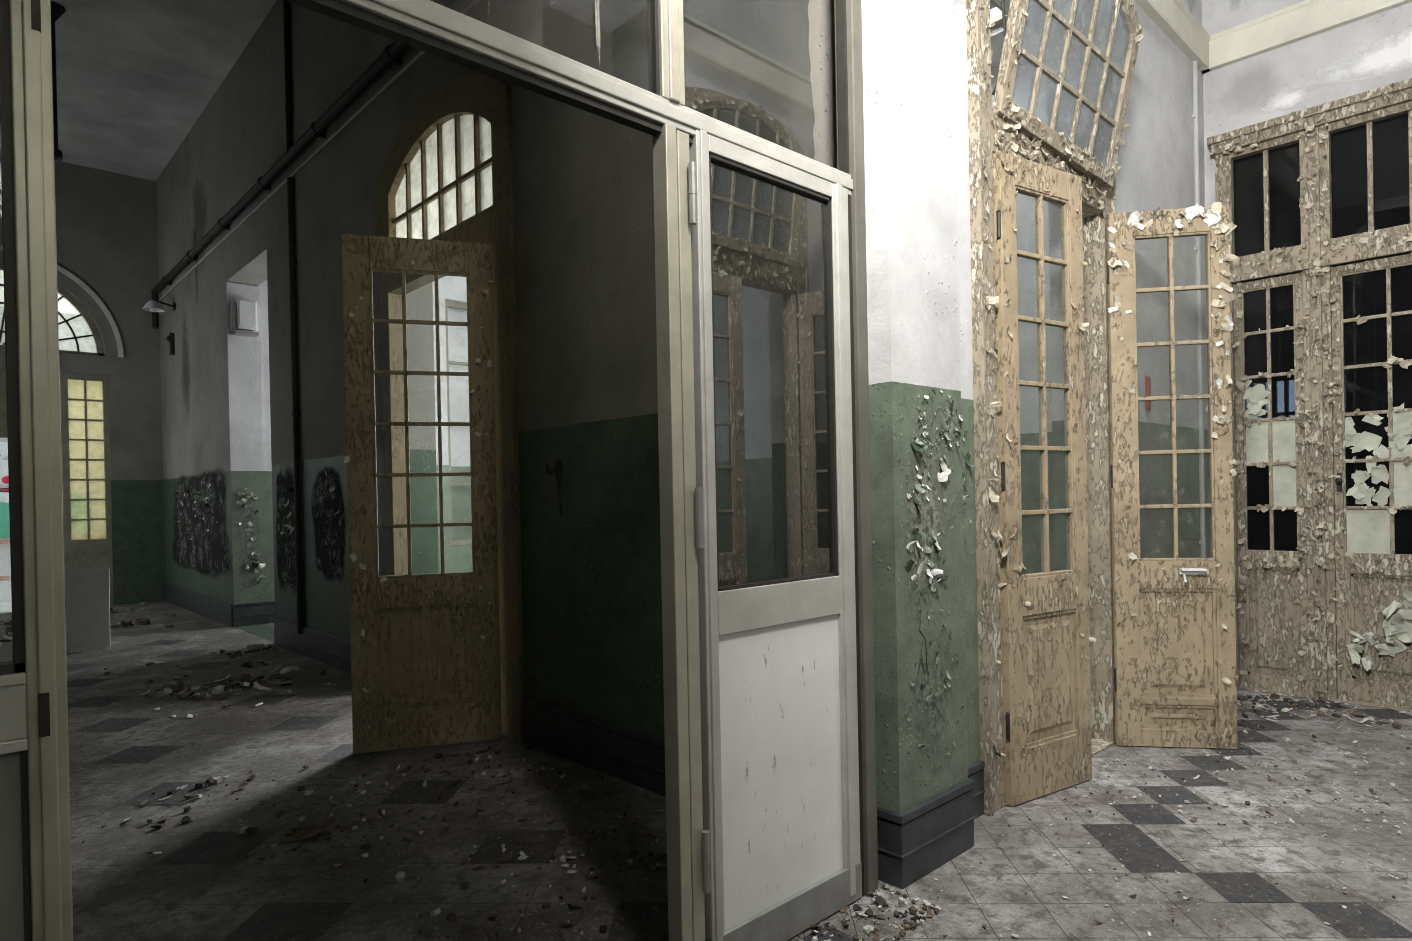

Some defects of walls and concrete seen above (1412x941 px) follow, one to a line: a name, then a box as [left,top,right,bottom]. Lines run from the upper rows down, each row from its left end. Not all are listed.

peeling [172,469,296,592]
peeling [904,388,974,786]
peeling [980,2,1412,685]